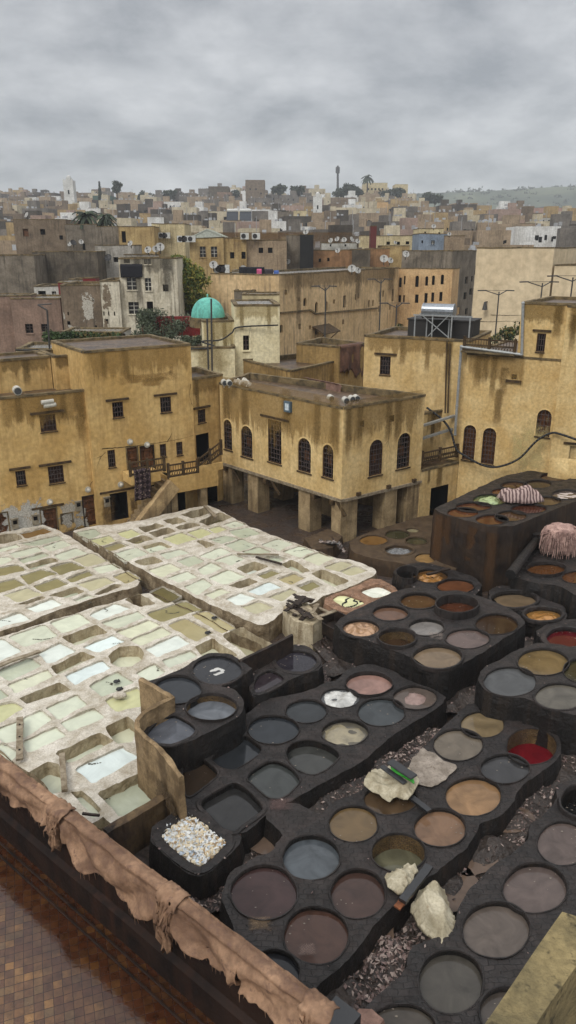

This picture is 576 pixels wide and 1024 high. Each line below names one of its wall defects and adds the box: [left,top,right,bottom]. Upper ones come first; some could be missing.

spalling [63,284,111,328]
damp [470,355,523,416]
spalling [0,497,368,831]